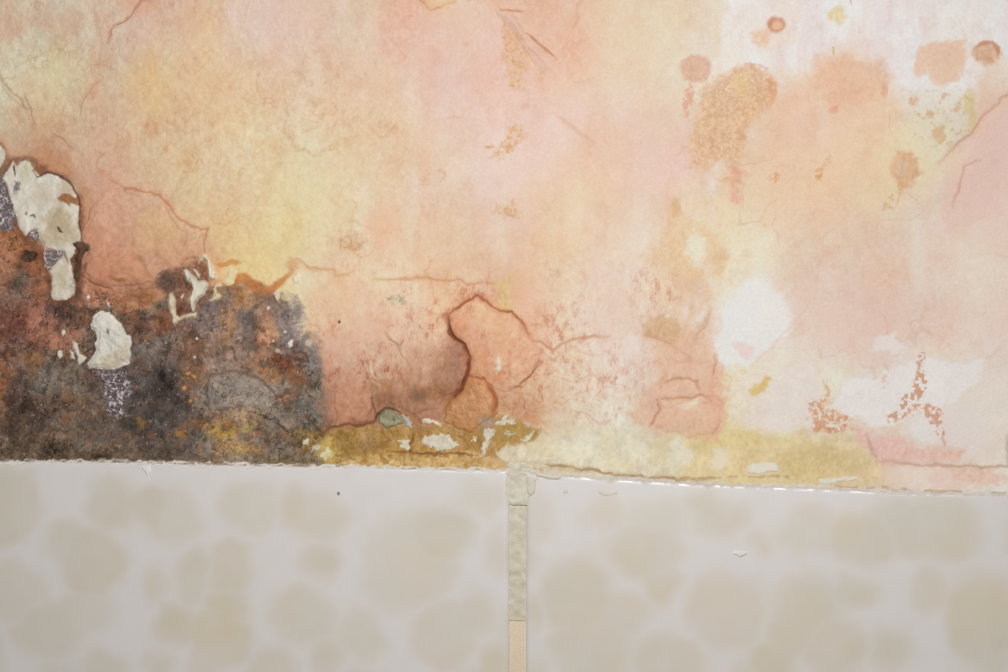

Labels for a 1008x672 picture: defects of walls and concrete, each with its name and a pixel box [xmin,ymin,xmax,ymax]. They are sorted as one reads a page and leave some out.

crack [417,0,459,15]
rust [678,0,1008,213]
crack [934,90,1008,211]
spalling [0,140,134,368]
crack [104,175,213,255]
peeling [152,252,239,327]
crack [201,368,377,437]
crack [283,332,311,365]
crack [385,432,480,458]
crack [292,256,612,416]
water stain [0,0,1008,491]
crack [648,304,719,431]